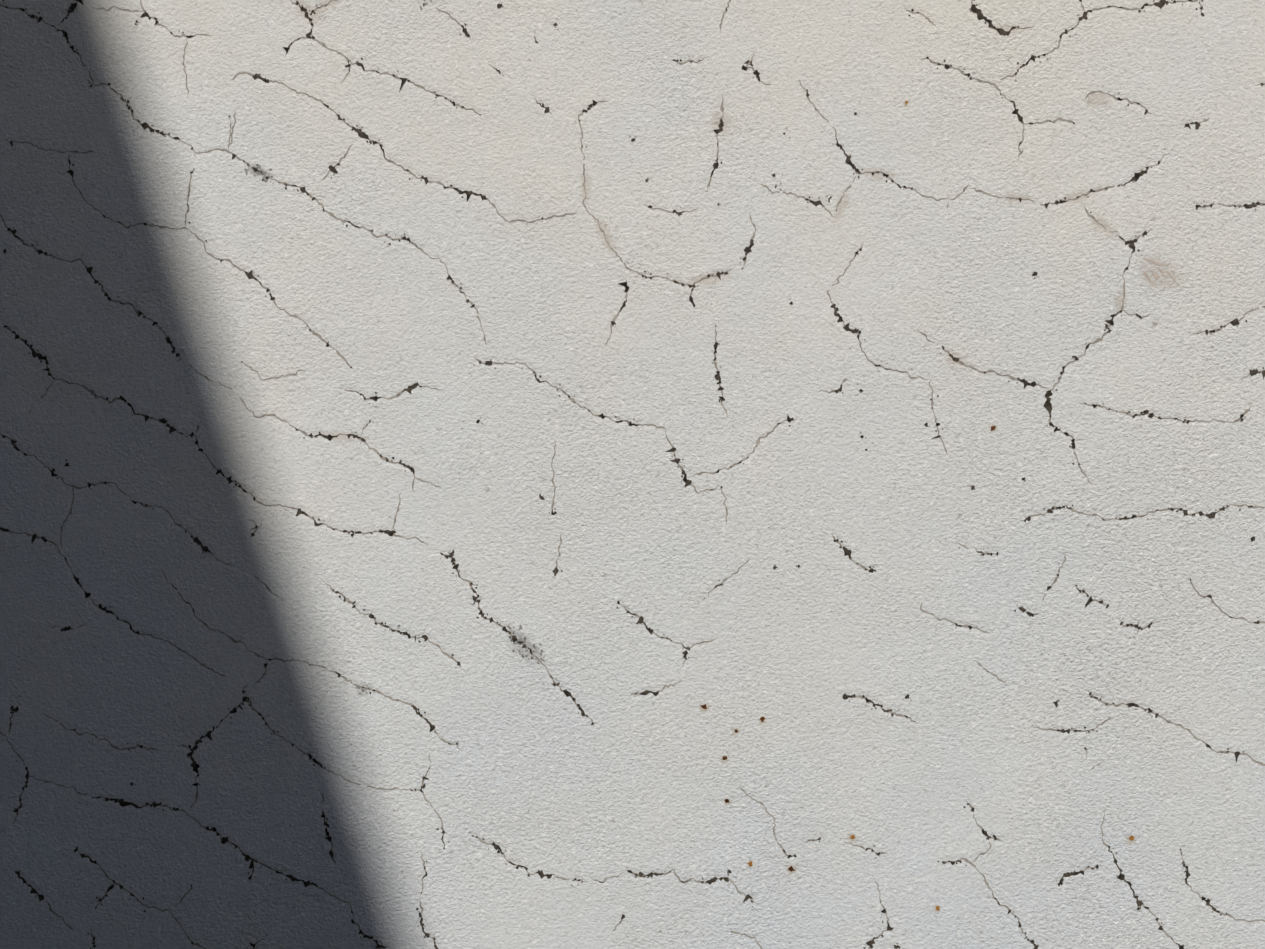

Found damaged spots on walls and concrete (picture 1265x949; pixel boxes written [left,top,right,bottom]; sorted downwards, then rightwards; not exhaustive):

crack [0,0,1265,725]
crack [0,433,763,949]
crack [1033,691,1265,770]
crack [738,788,900,949]
crack [938,800,1039,949]
crack [1056,813,1184,949]
crack [1180,849,1265,922]